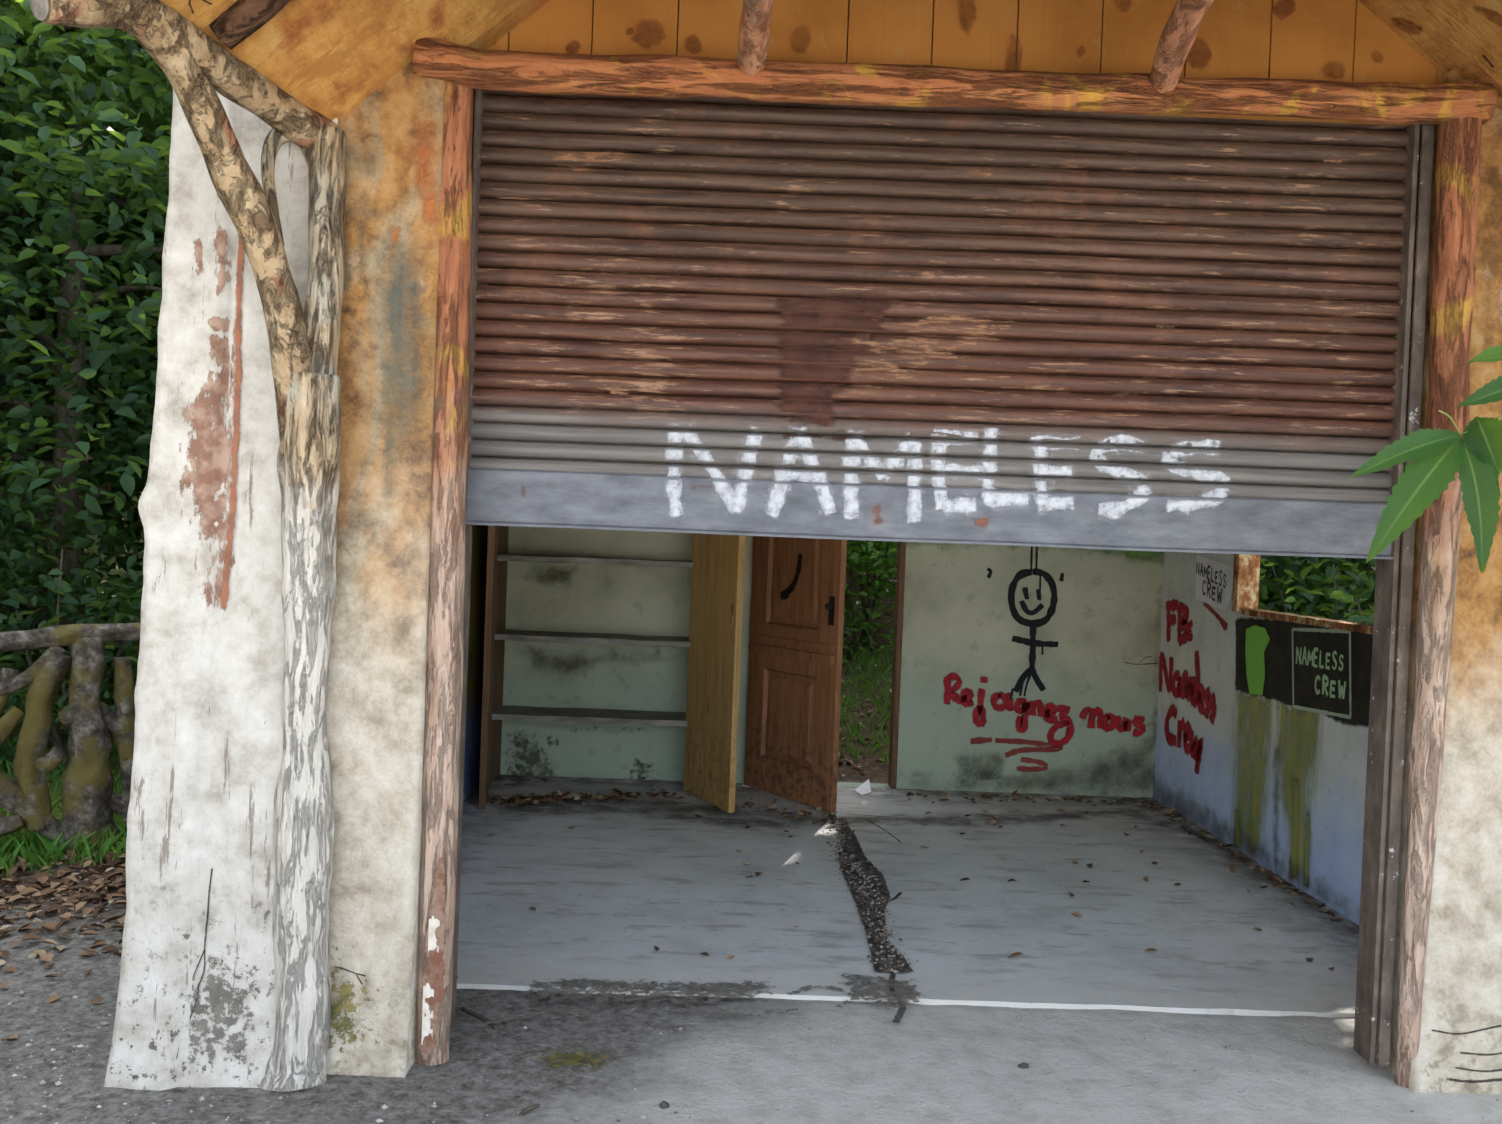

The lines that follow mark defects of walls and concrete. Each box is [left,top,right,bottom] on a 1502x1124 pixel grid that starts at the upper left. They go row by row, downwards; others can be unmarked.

corrosion [511,97,705,108]
peeling [192,226,232,296]
corrosion [777,297,889,441]
peeling [179,317,236,610]
crack [821,813,930,1023]